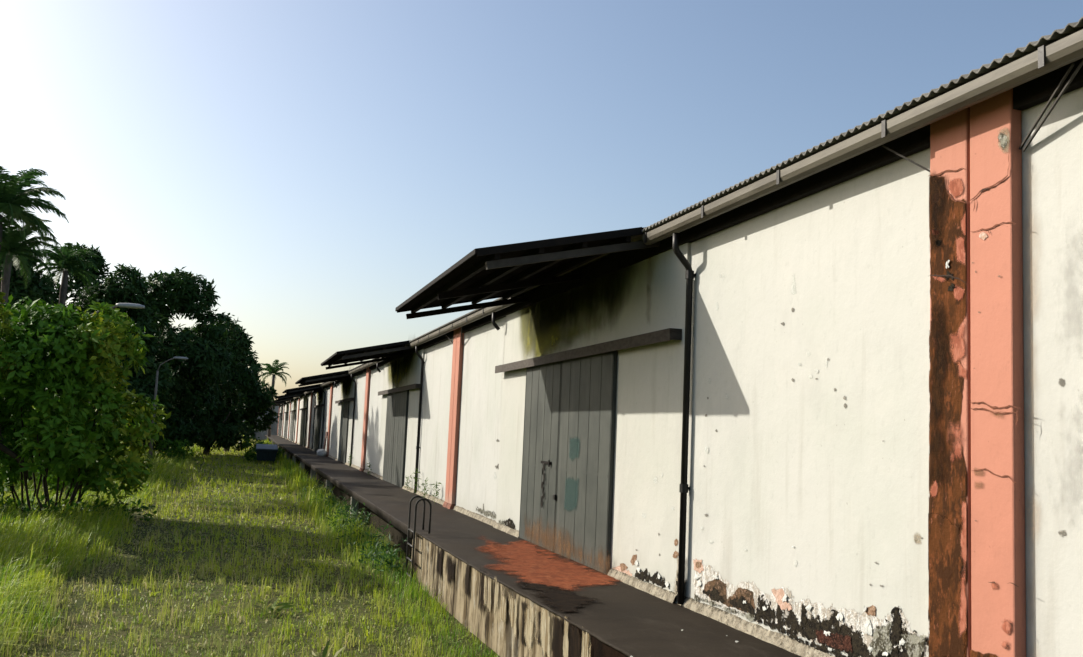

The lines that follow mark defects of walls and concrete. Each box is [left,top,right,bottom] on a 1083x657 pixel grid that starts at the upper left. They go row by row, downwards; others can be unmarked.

crack [929,167,1015,240]
rust [928,175,997,657]
crack [970,402,1021,428]
leakage [476,504,516,530]
peeling [613,549,638,576]
leakage [436,548,602,657]
peeling [693,559,929,657]